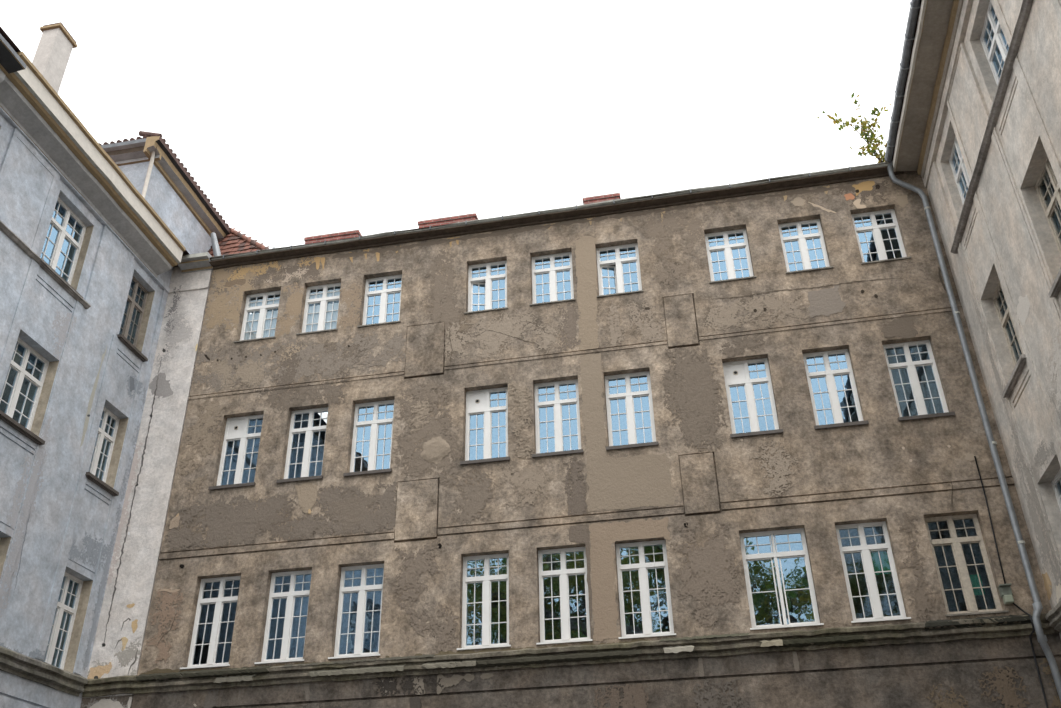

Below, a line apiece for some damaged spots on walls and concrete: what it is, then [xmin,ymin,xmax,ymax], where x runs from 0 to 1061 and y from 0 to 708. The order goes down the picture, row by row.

crack [104,356,177,674]
spalling [87,603,143,679]
peeling [90,697,132,708]